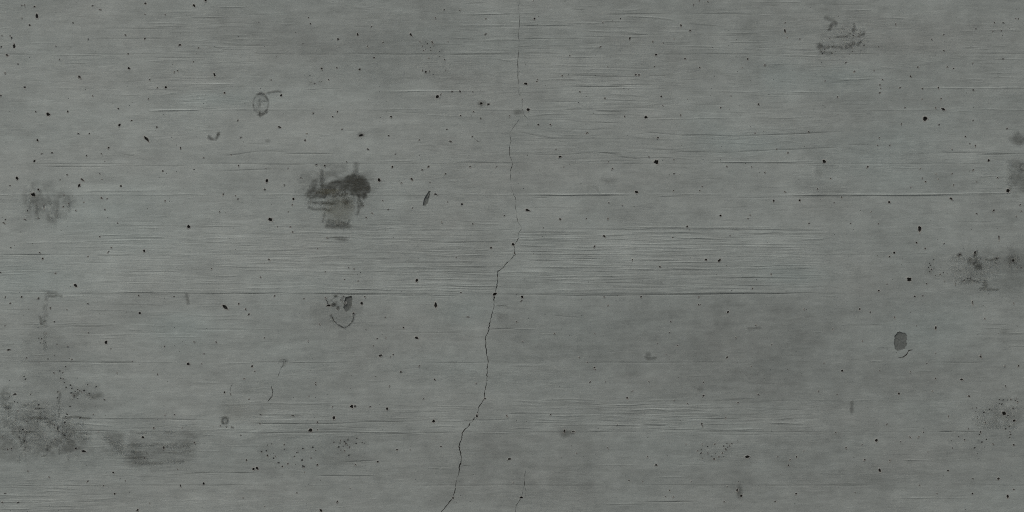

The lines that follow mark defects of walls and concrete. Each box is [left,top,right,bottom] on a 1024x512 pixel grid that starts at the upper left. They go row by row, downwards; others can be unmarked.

water stain [308,174,370,203]
crack [441,95,526,512]